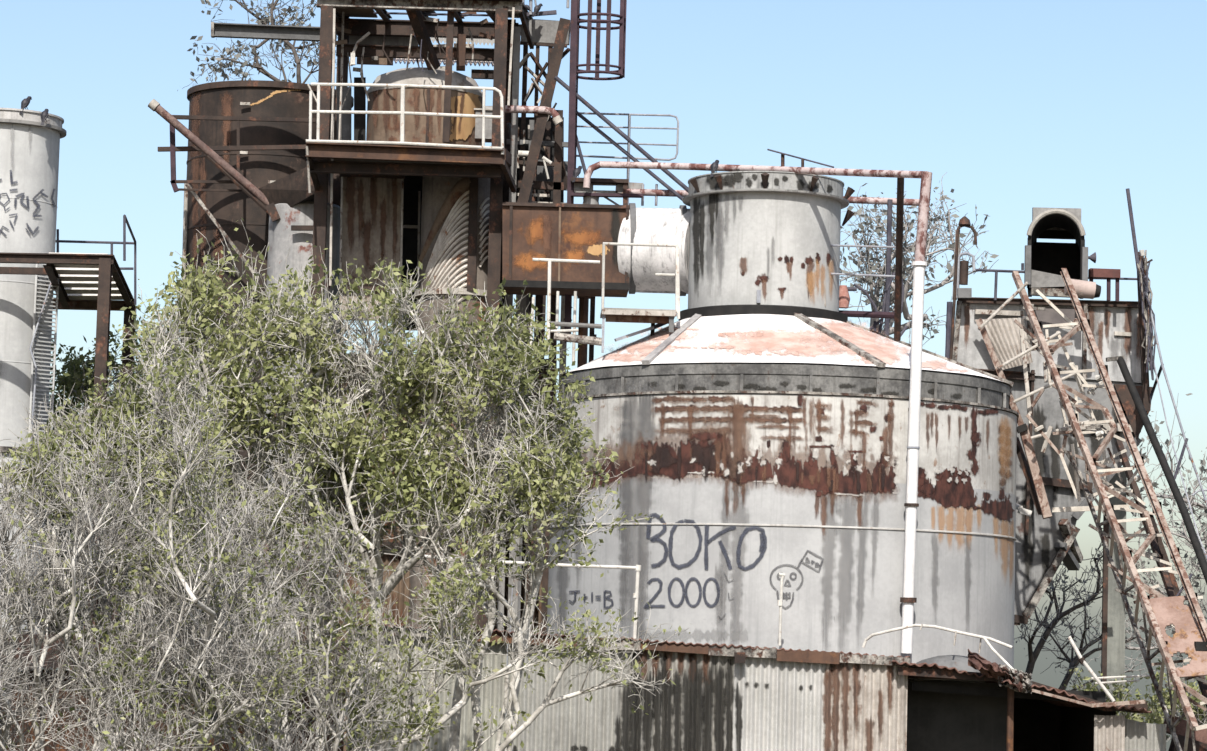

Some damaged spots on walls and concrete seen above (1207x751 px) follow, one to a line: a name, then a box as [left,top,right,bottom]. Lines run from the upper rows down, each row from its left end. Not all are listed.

corrosion [222,95,232,161]
corrosion [250,89,301,106]
corrosion [191,92,223,299]
corrosion [502,206,629,297]
leakage [692,169,833,284]
corrosion [740,253,833,298]
corrosion [605,321,908,365]
corrosion [922,360,967,372]
corrosion [645,394,894,531]
corrosion [920,402,1012,486]
leakage [609,650,769,751]
corrosion [823,663,894,751]